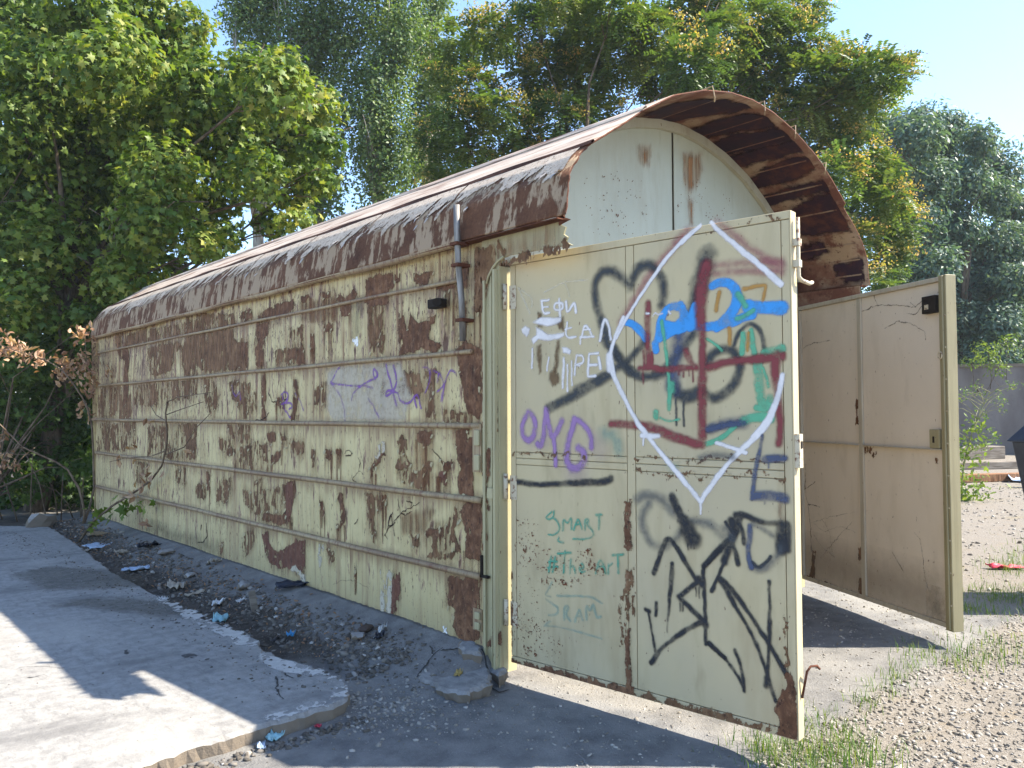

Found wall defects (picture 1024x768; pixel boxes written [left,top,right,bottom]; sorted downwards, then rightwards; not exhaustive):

corrosion [642,99,853,261]
peeling [102,147,580,315]
corrosion [833,257,865,284]
peeling [274,325,303,366]
peeling [314,381,327,408]
peeling [423,366,468,423]
peeling [96,378,283,517]
peeling [364,493,382,543]
peeling [410,507,461,560]
corrosion [623,499,633,551]
peeling [380,569,392,613]
corrosion [446,519,797,740]